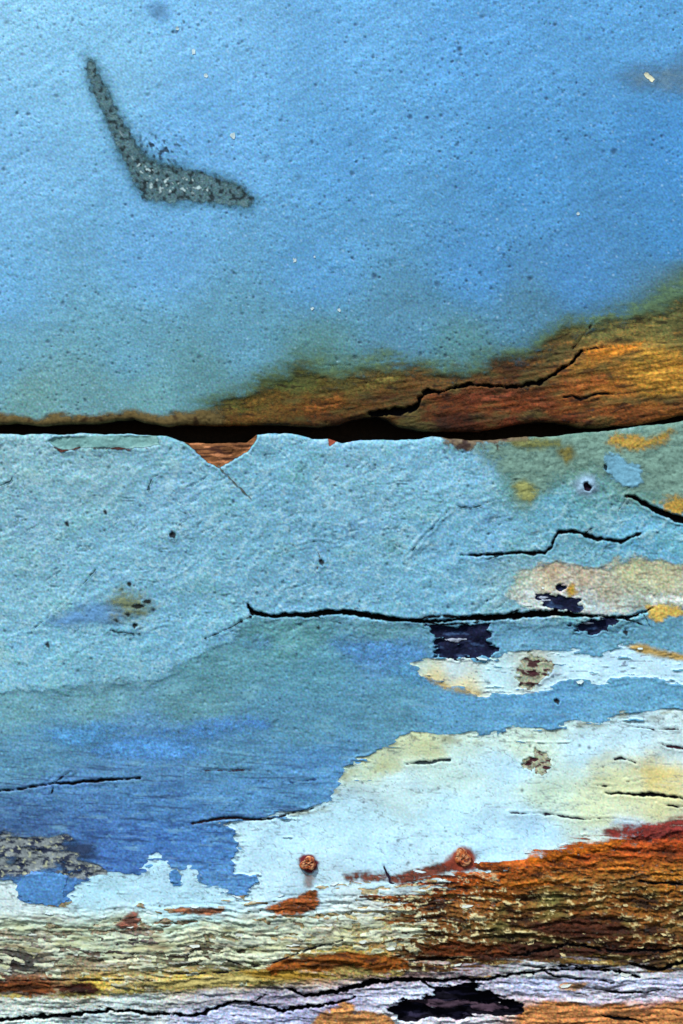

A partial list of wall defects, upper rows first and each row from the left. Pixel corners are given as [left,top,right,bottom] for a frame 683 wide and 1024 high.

rust [202,278,683,433]
crack [469,495,683,560]
crack [204,604,650,639]
crack [0,772,141,794]
peeling [0,557,683,1024]
rust [266,816,683,978]
crack [0,930,683,1023]